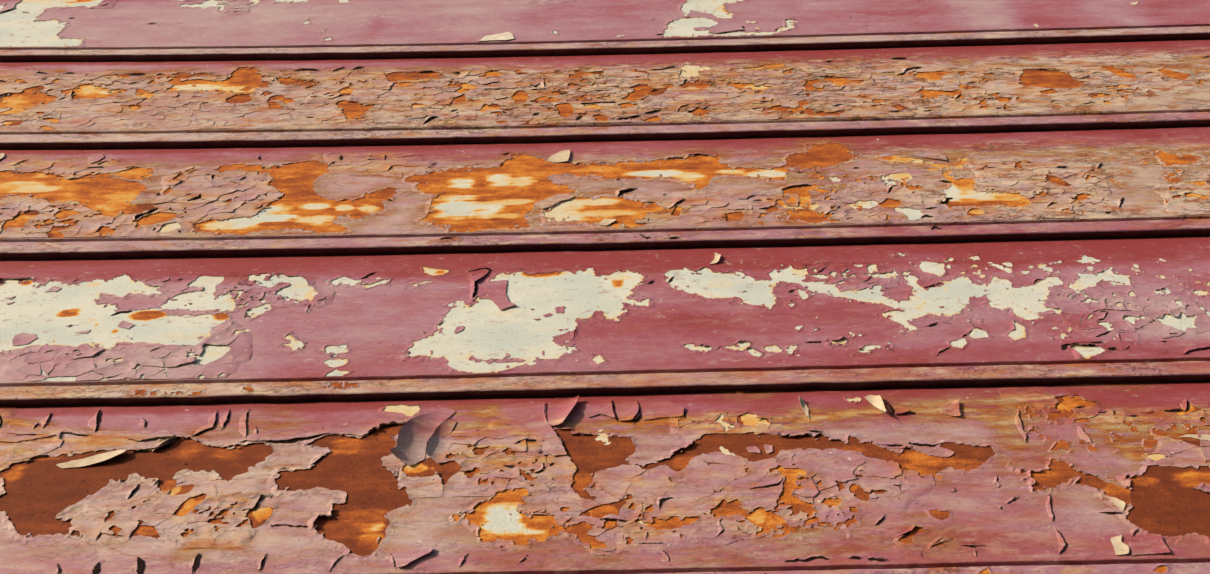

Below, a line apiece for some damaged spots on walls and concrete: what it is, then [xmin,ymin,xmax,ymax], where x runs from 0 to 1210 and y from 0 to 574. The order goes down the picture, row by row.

peeling [0,0,119,47]
rust [0,67,380,119]
rust [727,62,845,119]
rust [920,57,1210,110]
rust [0,139,1047,237]
peeling [805,151,1124,224]
peeling [0,251,1210,382]
peeling [0,407,176,471]
peeling [68,479,281,549]
rust [0,418,417,566]
peeling [378,395,935,555]
rust [433,396,1210,558]